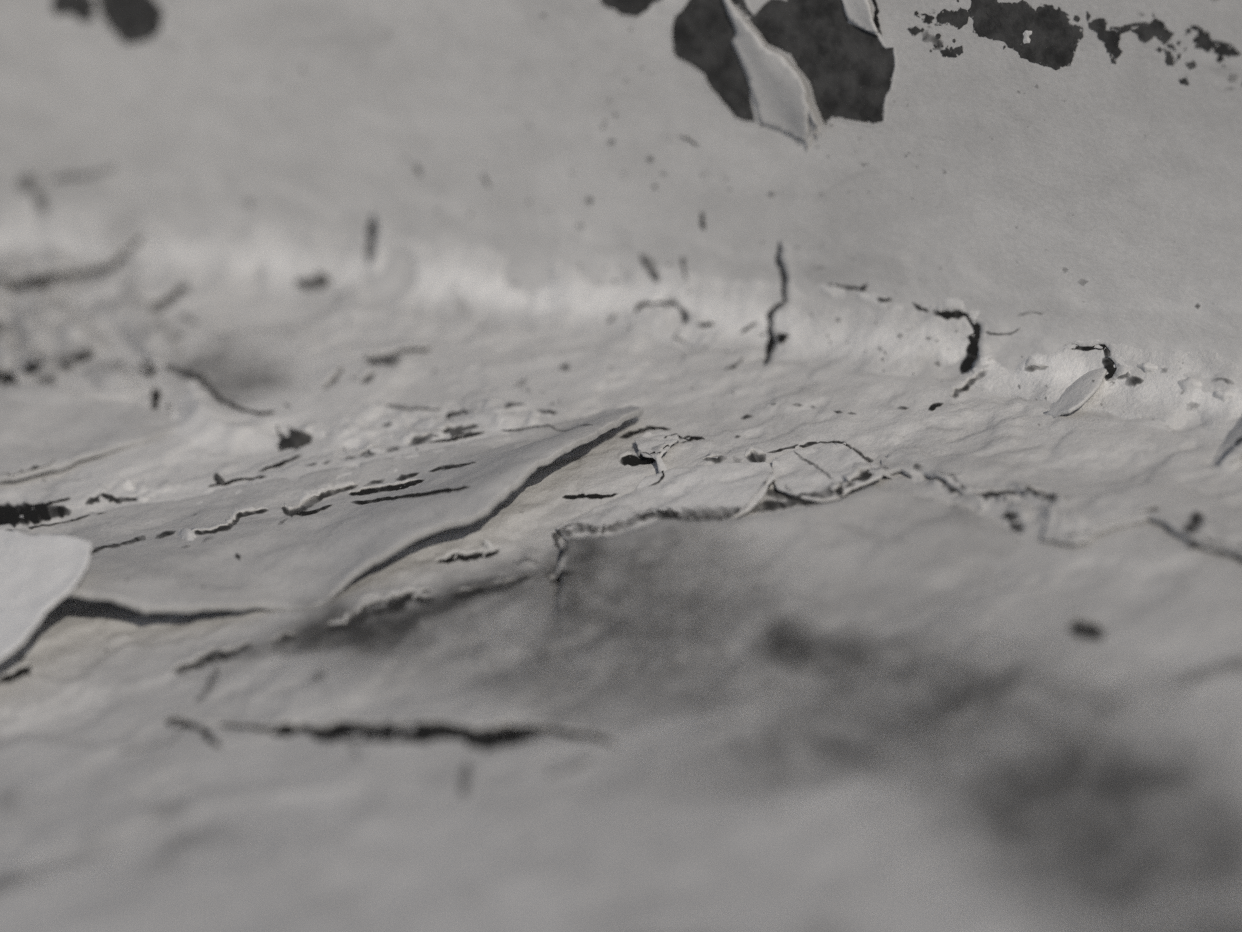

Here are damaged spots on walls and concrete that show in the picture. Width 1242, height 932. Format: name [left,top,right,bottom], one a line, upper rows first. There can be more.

peeling [51,0,168,48]
peeling [597,0,665,20]
peeling [669,0,898,150]
peeling [907,0,1241,85]
crack [698,212,706,229]
crack [609,240,796,368]
crack [828,284,1133,411]